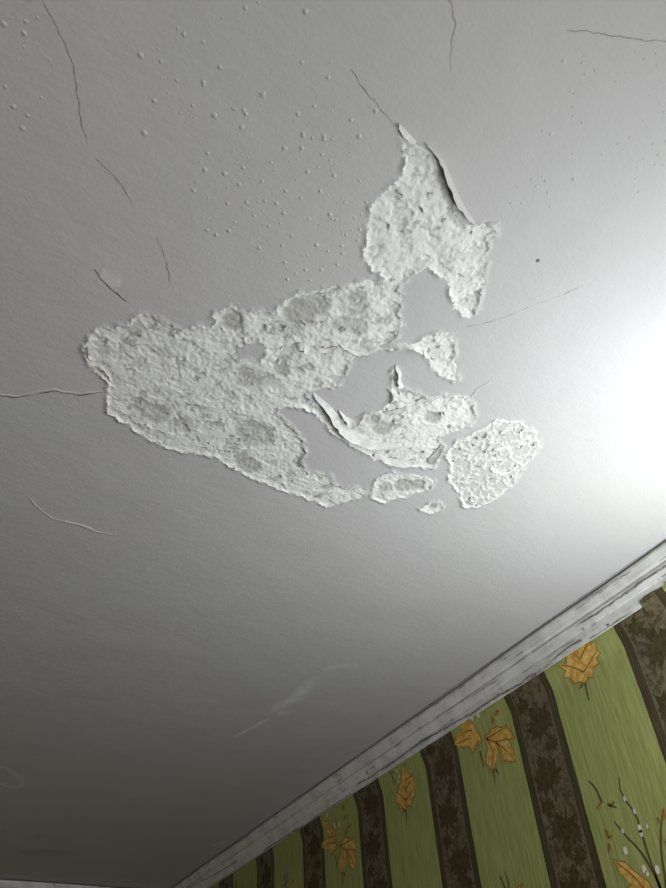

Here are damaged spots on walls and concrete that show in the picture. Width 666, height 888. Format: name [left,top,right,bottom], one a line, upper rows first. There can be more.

crack [448,0,456,65]
crack [567,30,666,42]
crack [29,0,87,139]
crack [351,70,391,120]
crack [95,158,132,205]
crack [94,269,127,302]
peeling [82,124,540,508]
crack [0,388,104,398]
crack [28,498,119,535]
flaking render [420,502,443,514]